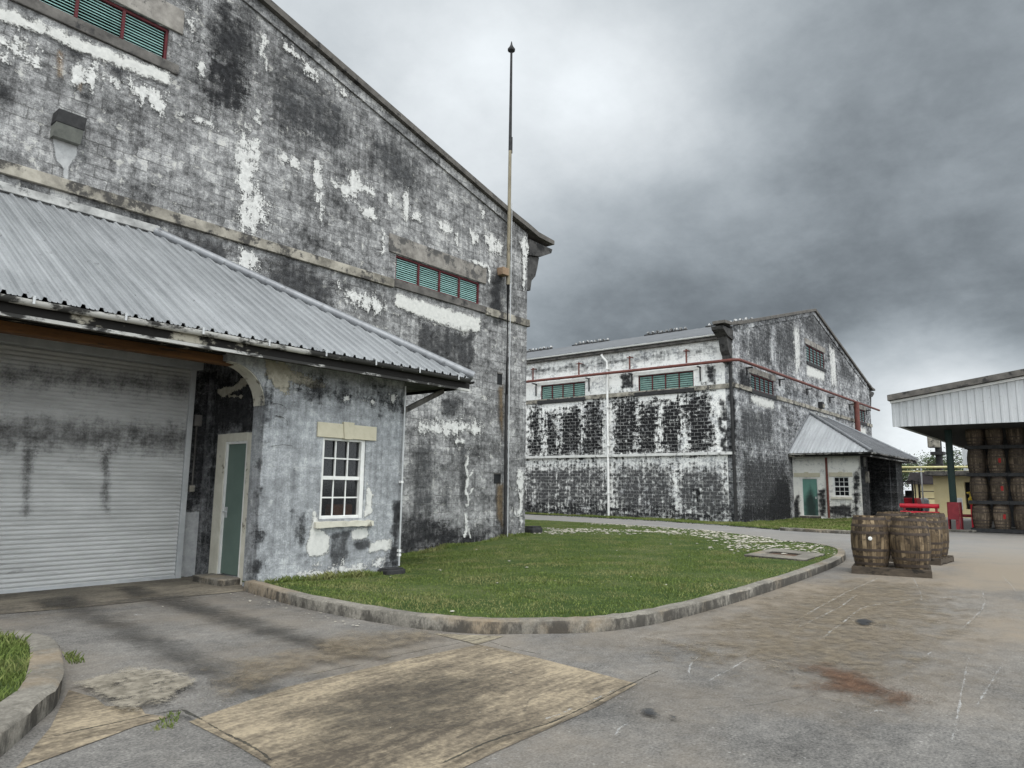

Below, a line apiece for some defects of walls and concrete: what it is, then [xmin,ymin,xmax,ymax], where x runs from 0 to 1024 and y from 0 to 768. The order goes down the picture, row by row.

peeling [0,27,44,73]
leakage [194,0,258,110]
peeling [258,31,354,99]
peeling [59,54,503,284]
peeling [337,279,388,320]
leakage [525,318,861,528]
peeling [306,483,392,565]